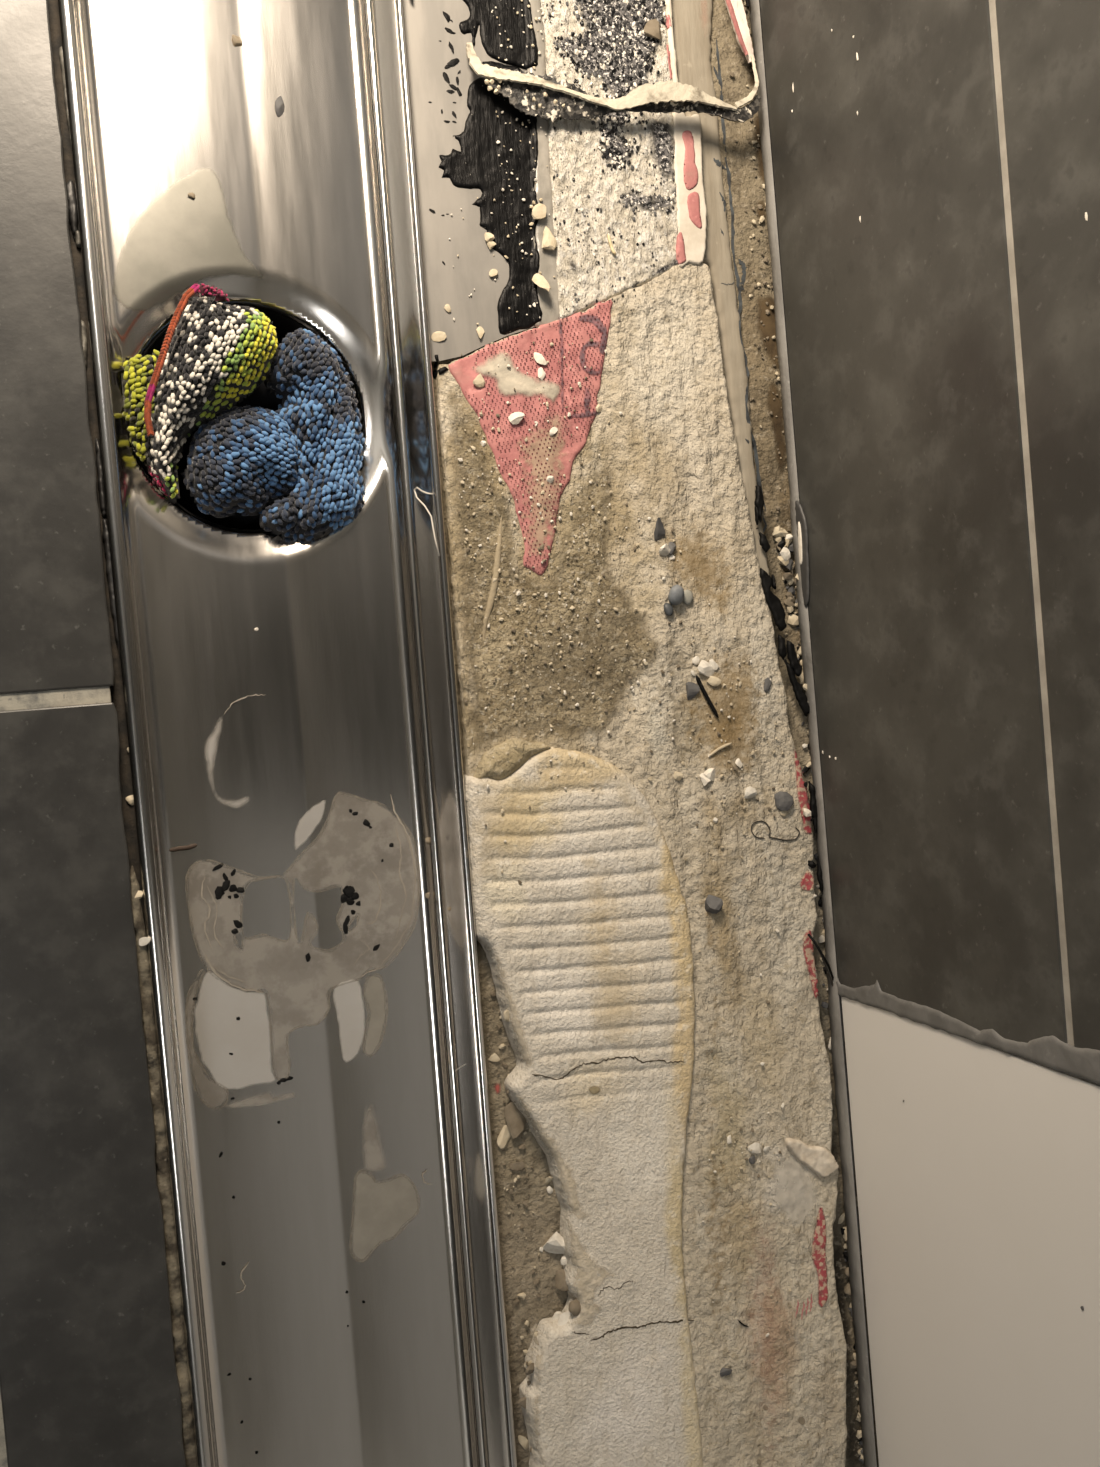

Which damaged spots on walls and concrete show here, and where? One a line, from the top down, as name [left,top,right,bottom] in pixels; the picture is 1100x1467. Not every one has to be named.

peeling [429,11,761,123]
peeling [484,232,496,250]
peeling [532,203,557,250]
peeling [532,273,551,291]
leakage [207,729,218,766]
leakage [353,797,416,1055]
crack [528,1056,683,1080]
leakage [353,1171,429,1260]
crack [574,1319,694,1340]